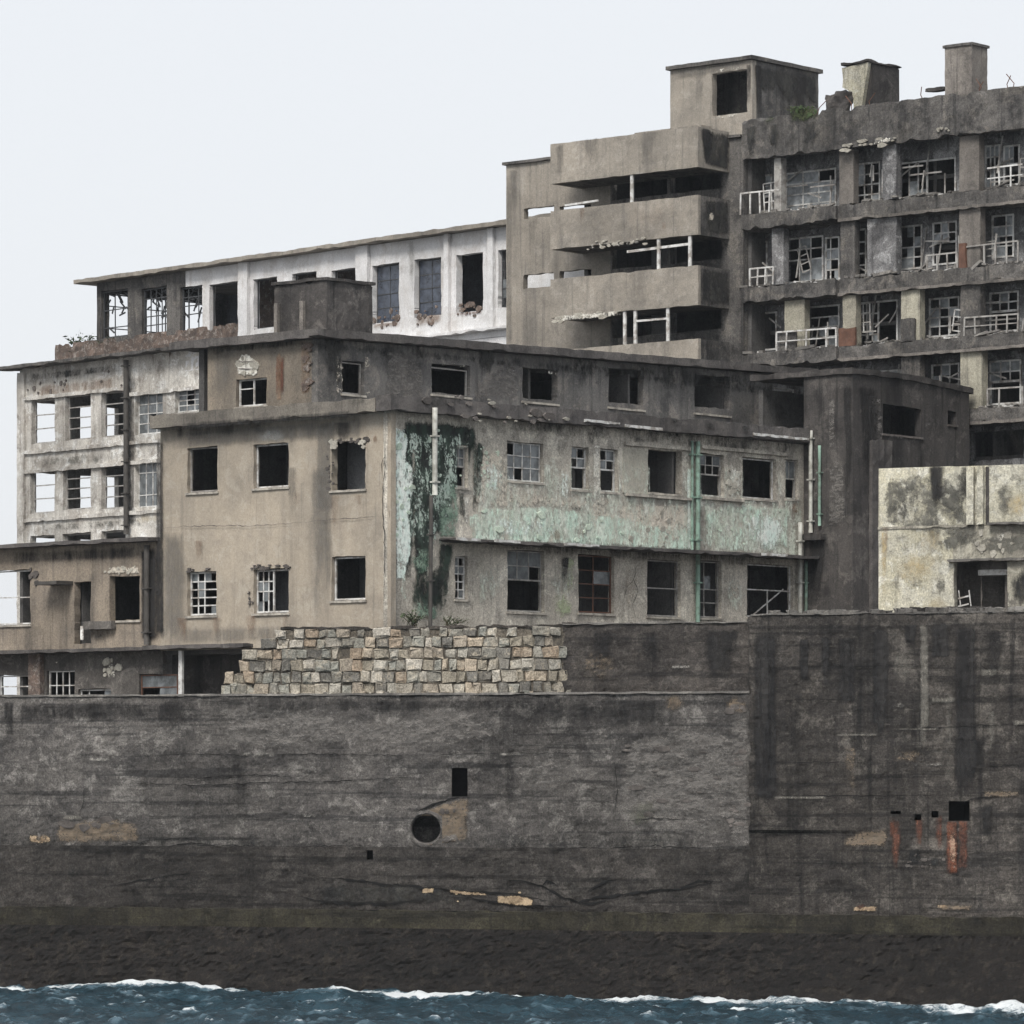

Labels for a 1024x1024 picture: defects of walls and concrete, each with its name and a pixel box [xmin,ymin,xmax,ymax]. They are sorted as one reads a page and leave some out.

spalling [839,137,897,153]
corrosion [414,305,439,326]
corrosion [457,301,482,317]
spalling [552,310,620,324]
damp [403,429,452,602]
damp [460,443,483,515]
peeling [463,445,801,555]
damp [885,466,977,550]
damp [905,623,1001,789]
corrosion [937,817,967,873]
spalling [450,890,532,906]
crack [299,876,722,907]